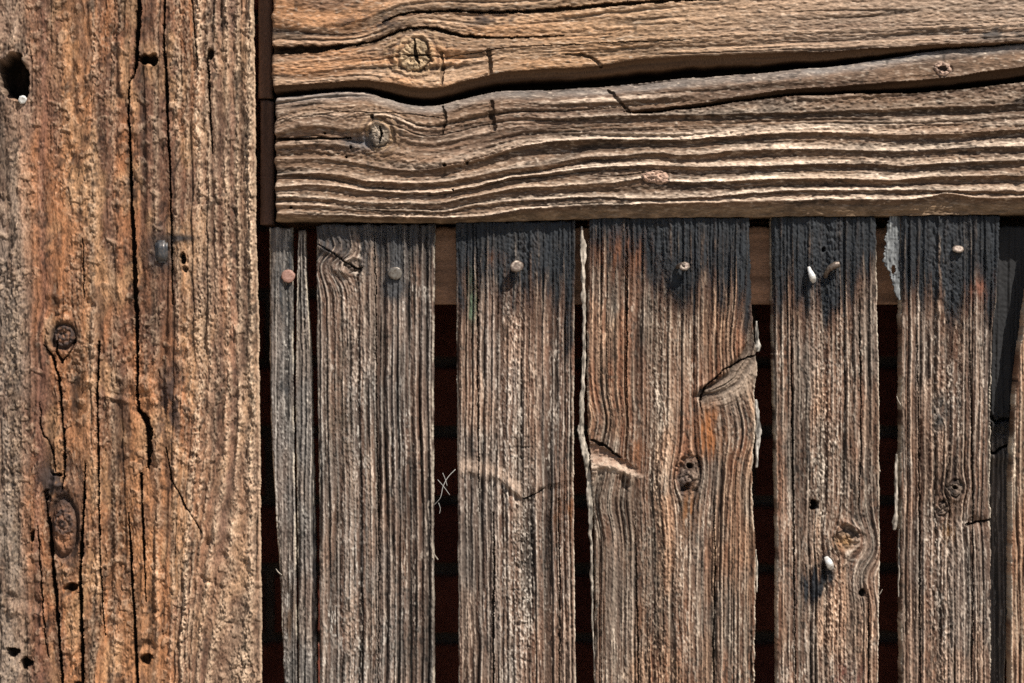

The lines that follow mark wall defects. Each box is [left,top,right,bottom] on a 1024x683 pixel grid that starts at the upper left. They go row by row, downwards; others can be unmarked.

crack [937,64,948,72]
crack [126,0,214,683]
crack [698,355,756,414]
crack [590,439,621,458]
crack [36,338,107,683]